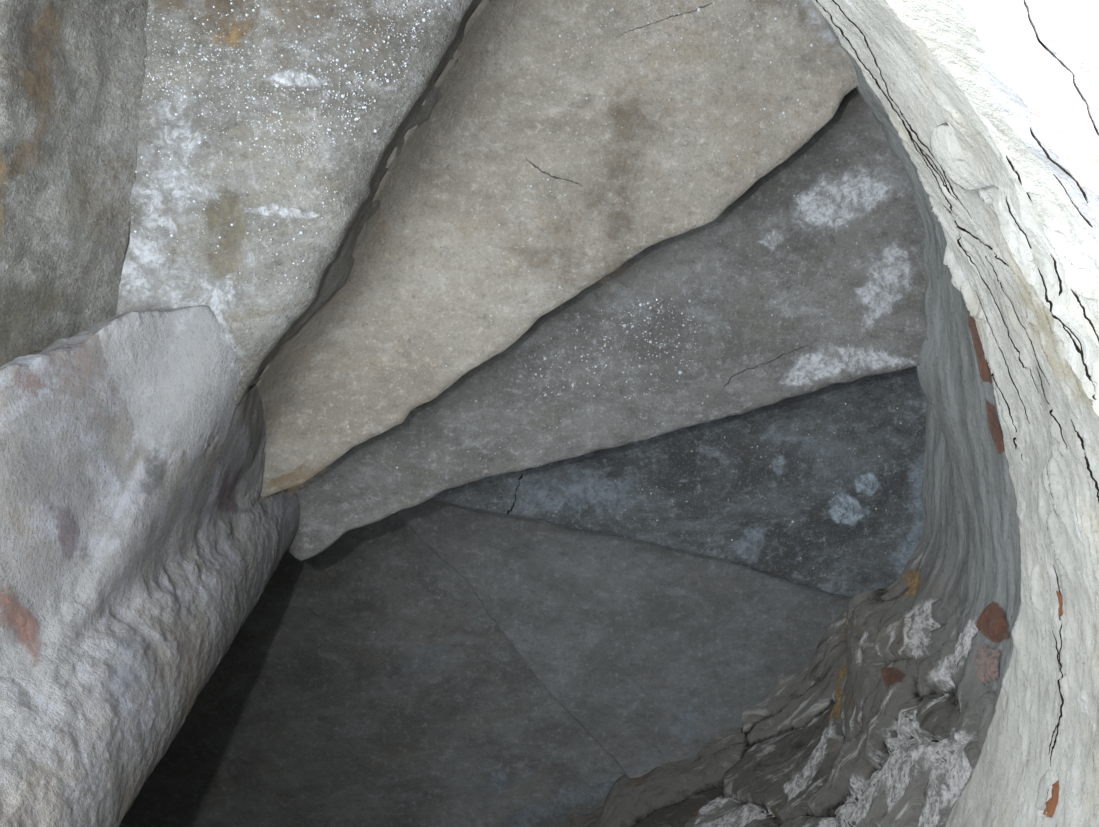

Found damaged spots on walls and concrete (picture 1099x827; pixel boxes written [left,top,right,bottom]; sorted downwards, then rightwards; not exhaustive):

crack [527,160,577,184]
leakage [796,170,891,227]
leakage [856,245,910,326]
crack [816,0,1099,503]
leakage [780,346,915,385]
crack [1049,565,1064,766]